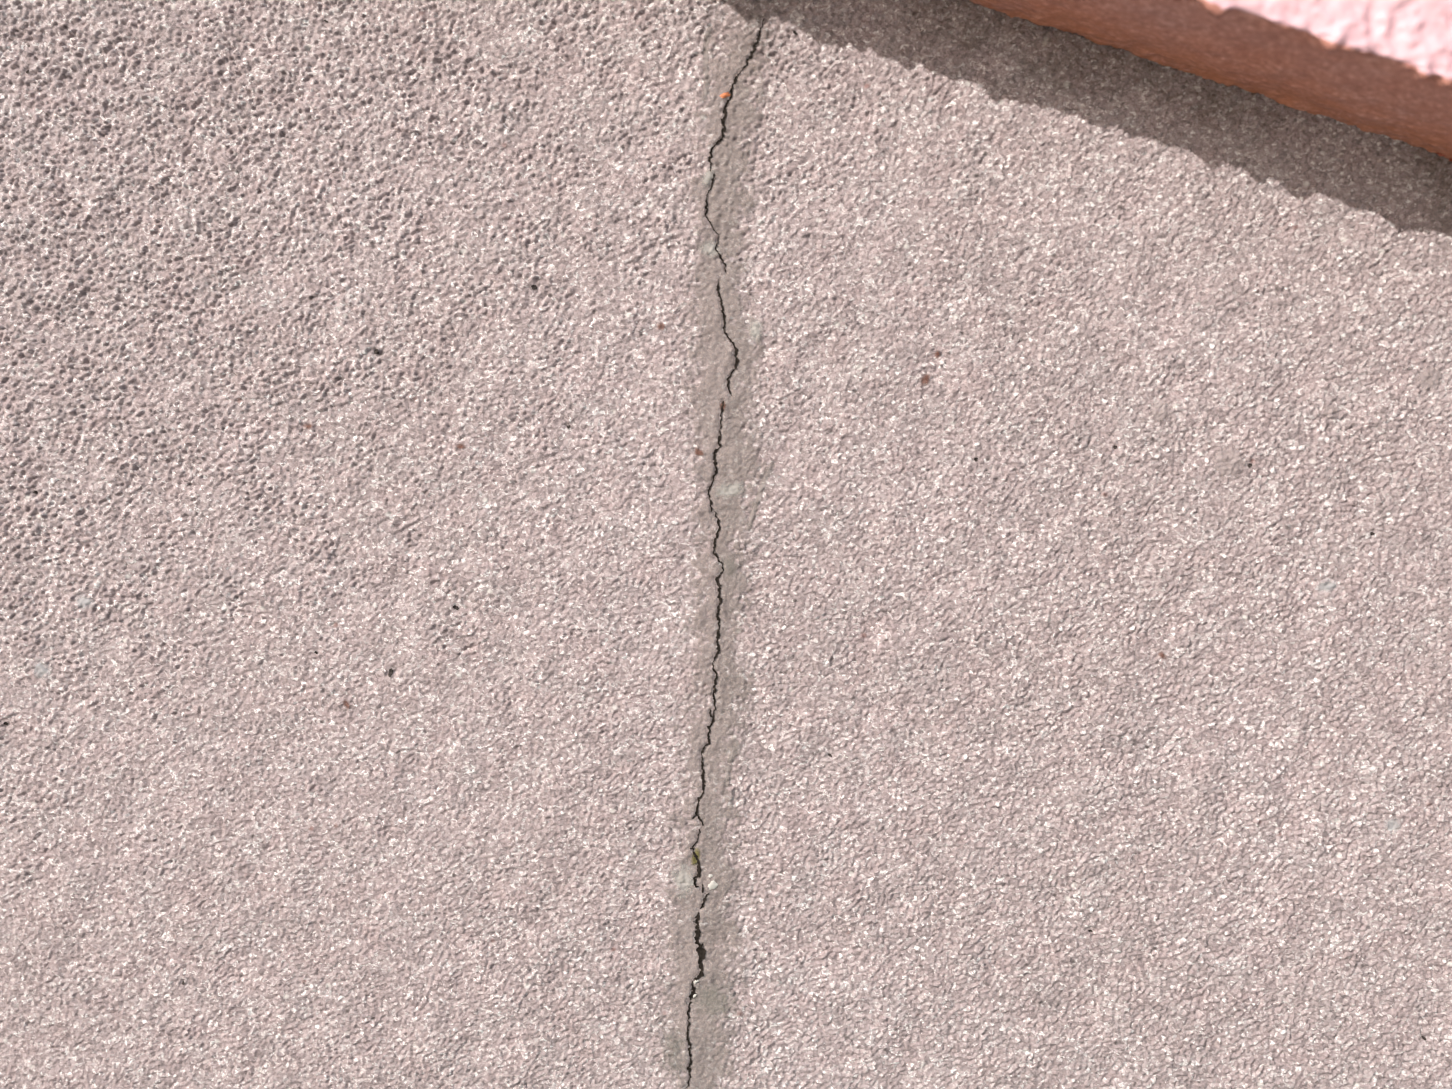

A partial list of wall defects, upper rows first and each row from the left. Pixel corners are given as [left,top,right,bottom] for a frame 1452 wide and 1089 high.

crack [686,19,764,1088]